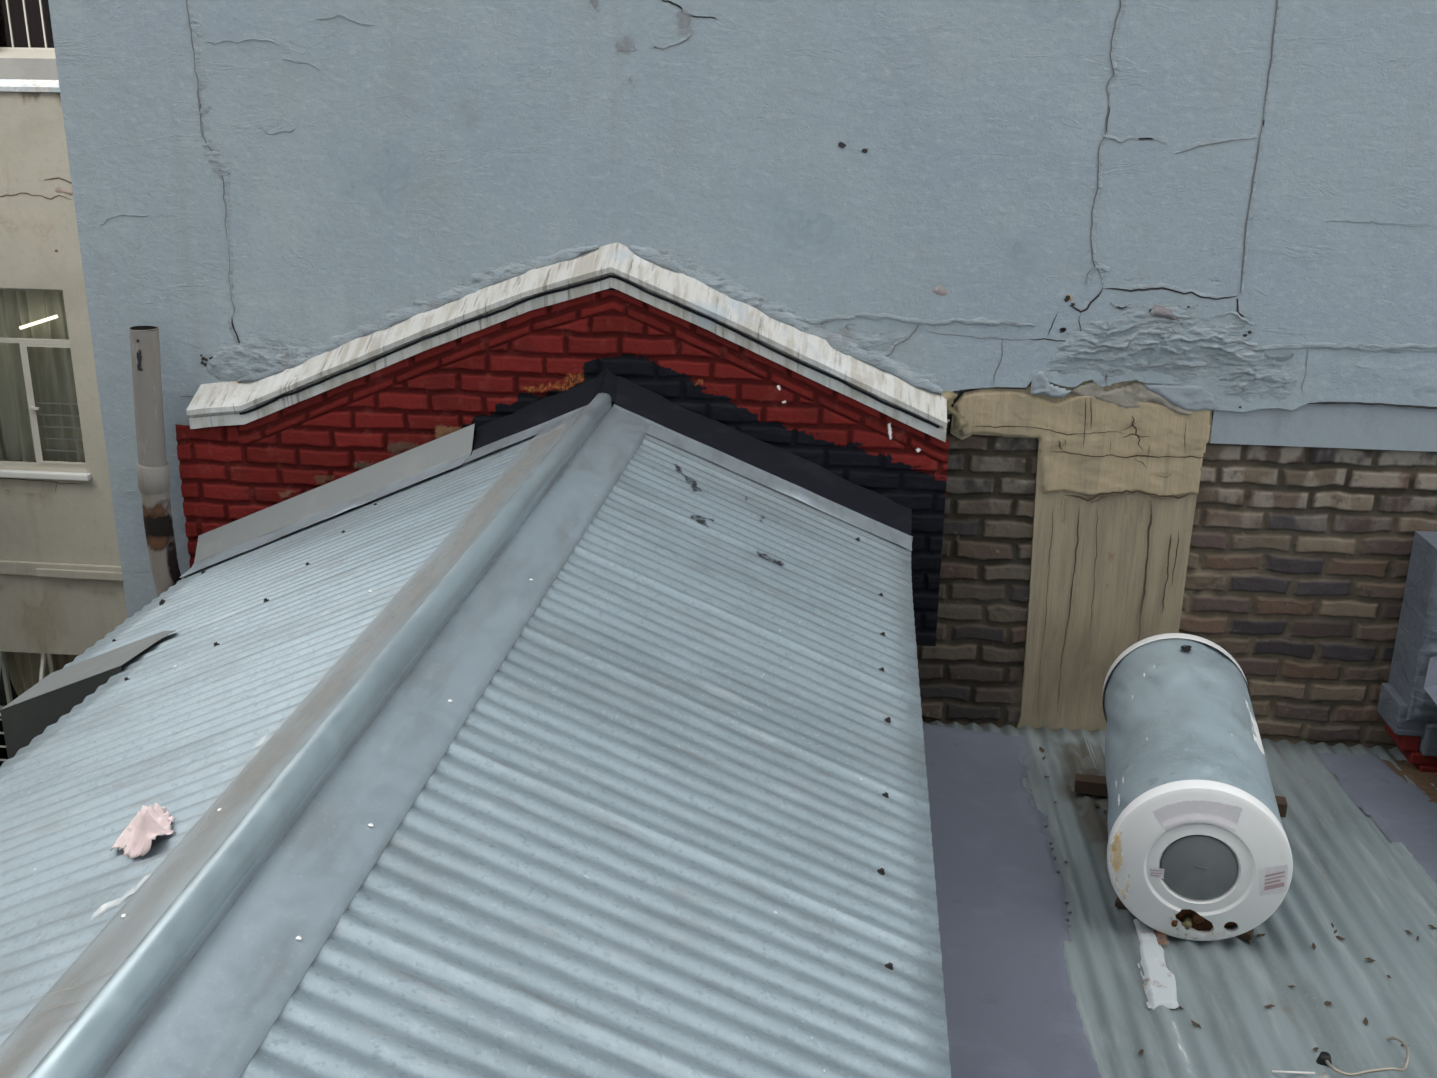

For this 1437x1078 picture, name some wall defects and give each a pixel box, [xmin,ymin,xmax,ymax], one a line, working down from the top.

crack [0,177,72,200]
corrosion [142,503,182,585]
crack [186,0,240,345]
flaking render [917,391,1039,728]
flaking render [1030,371,1219,415]
crack [885,0,1437,711]
flaking render [1149,305,1190,325]
flaking render [1179,442,1437,749]